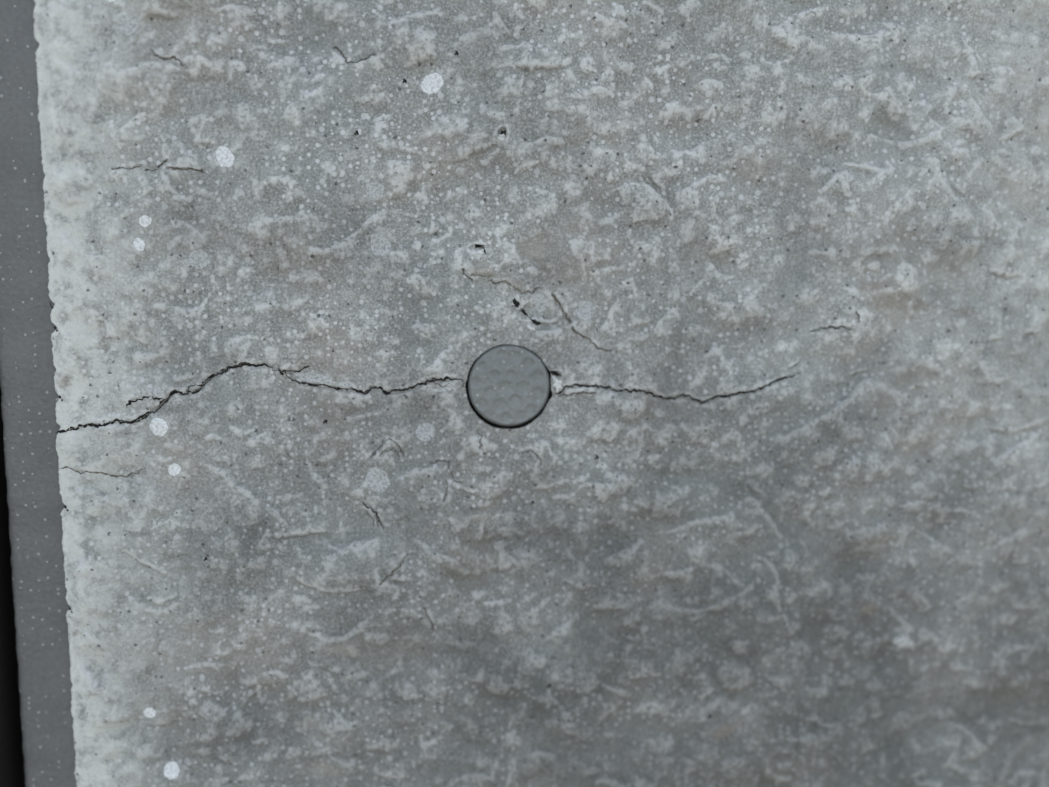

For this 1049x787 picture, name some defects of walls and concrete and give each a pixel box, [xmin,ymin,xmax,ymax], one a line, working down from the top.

crack [462,269,613,352]
crack [56,362,465,433]
crack [551,361,806,404]